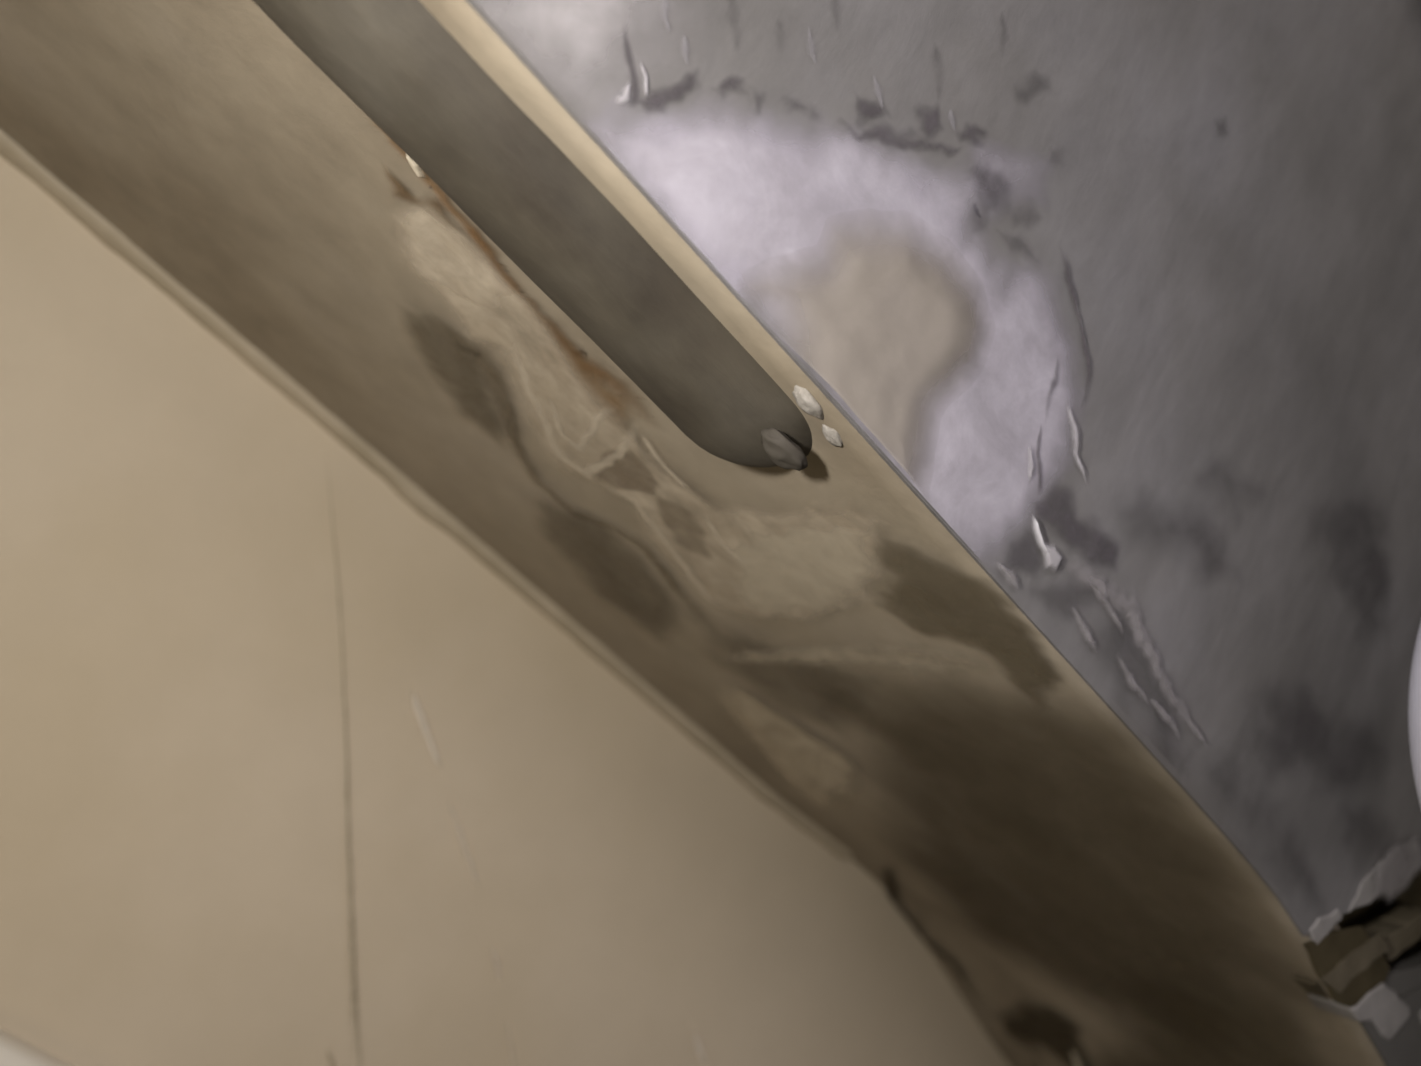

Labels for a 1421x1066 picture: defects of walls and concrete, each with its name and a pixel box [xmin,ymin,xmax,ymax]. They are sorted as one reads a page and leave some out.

leakage [490,0,649,83]
rust [385,133,616,402]
leakage [604,119,1071,550]
leakage [886,551,1052,698]
flaking render [1000,492,1204,741]
crack [333,528,356,1016]
leakage [869,712,1301,1066]
peeling [1377,839,1421,898]